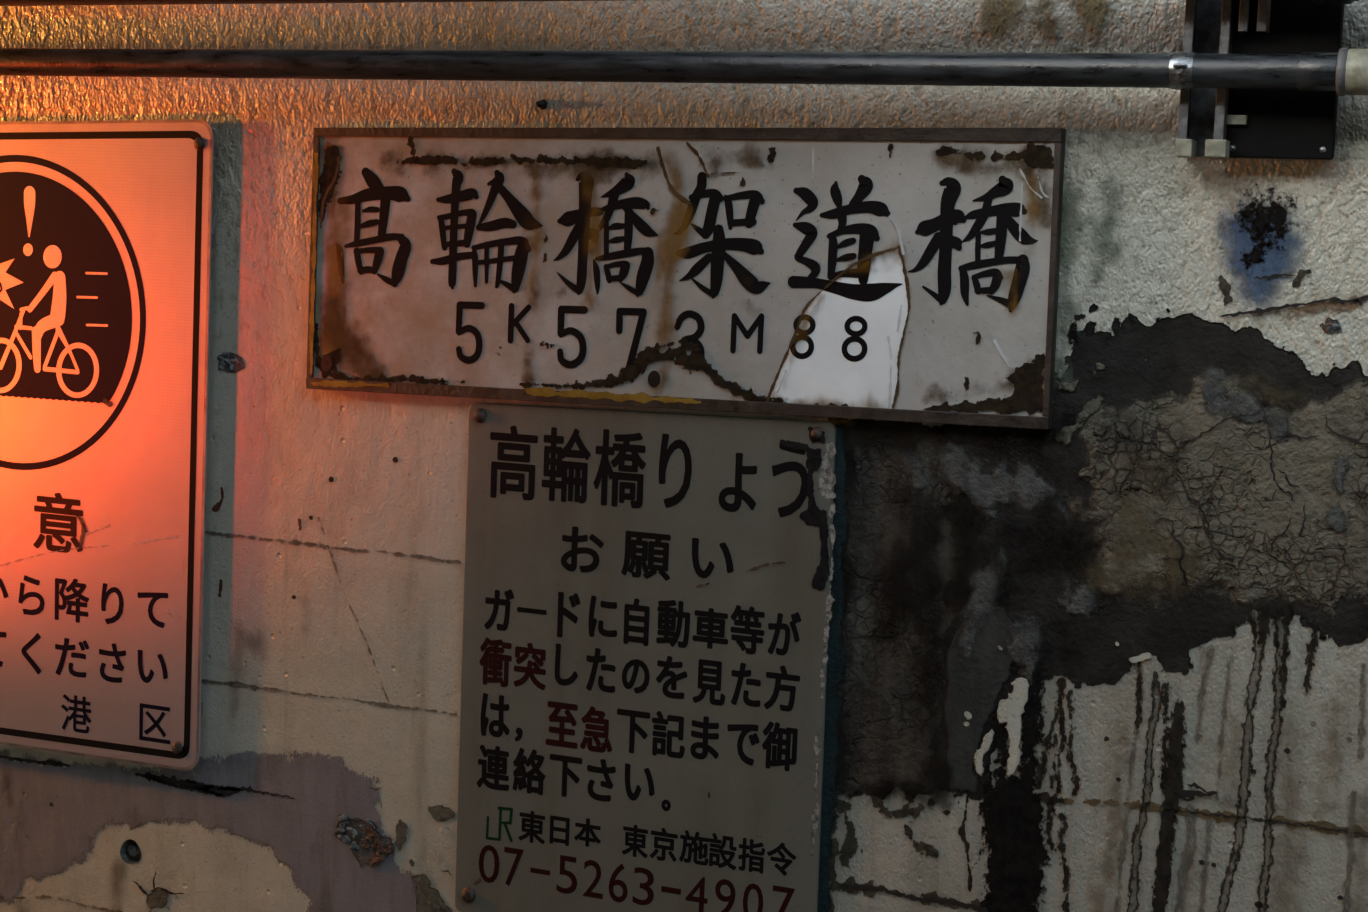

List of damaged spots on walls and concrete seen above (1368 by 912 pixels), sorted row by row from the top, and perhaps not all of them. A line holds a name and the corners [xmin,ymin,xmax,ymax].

leakage [982,0,1021,35]
leakage [1077,0,1107,34]
crack [1220,274,1368,317]
leakage [865,423,1062,453]
crack [1133,390,1368,593]
peeling [823,303,1368,804]
leakage [817,424,863,912]
leakage [871,489,1087,912]
leakage [1115,604,1320,912]
leakage [1357,664,1366,759]
spalling [133,872,184,912]
leakage [1342,791,1356,912]